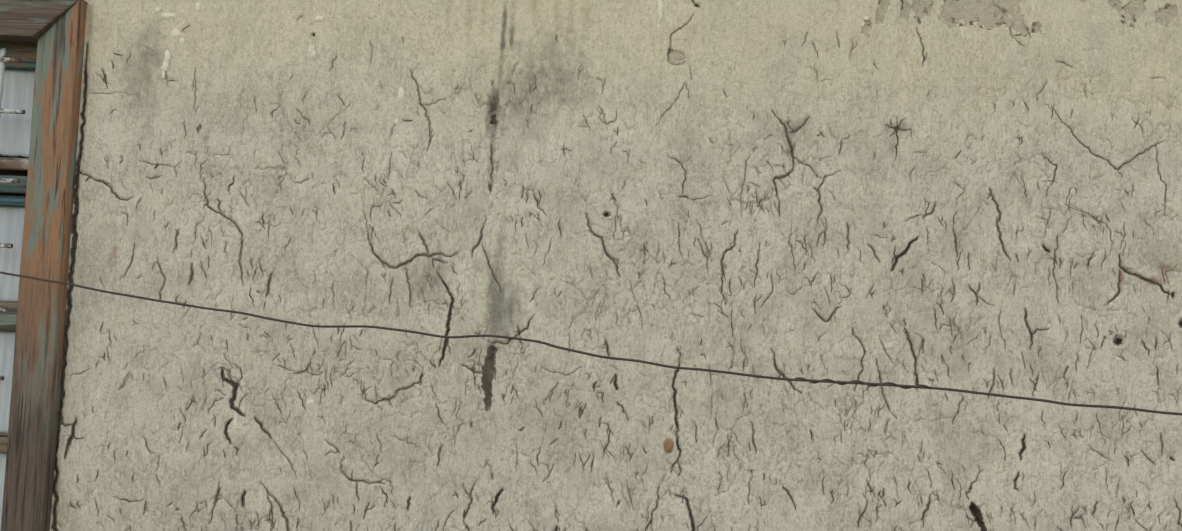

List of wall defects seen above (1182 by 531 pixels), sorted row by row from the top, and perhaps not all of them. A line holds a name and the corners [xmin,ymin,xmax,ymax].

crack [51,43,561,531]
crack [515,81,1182,531]